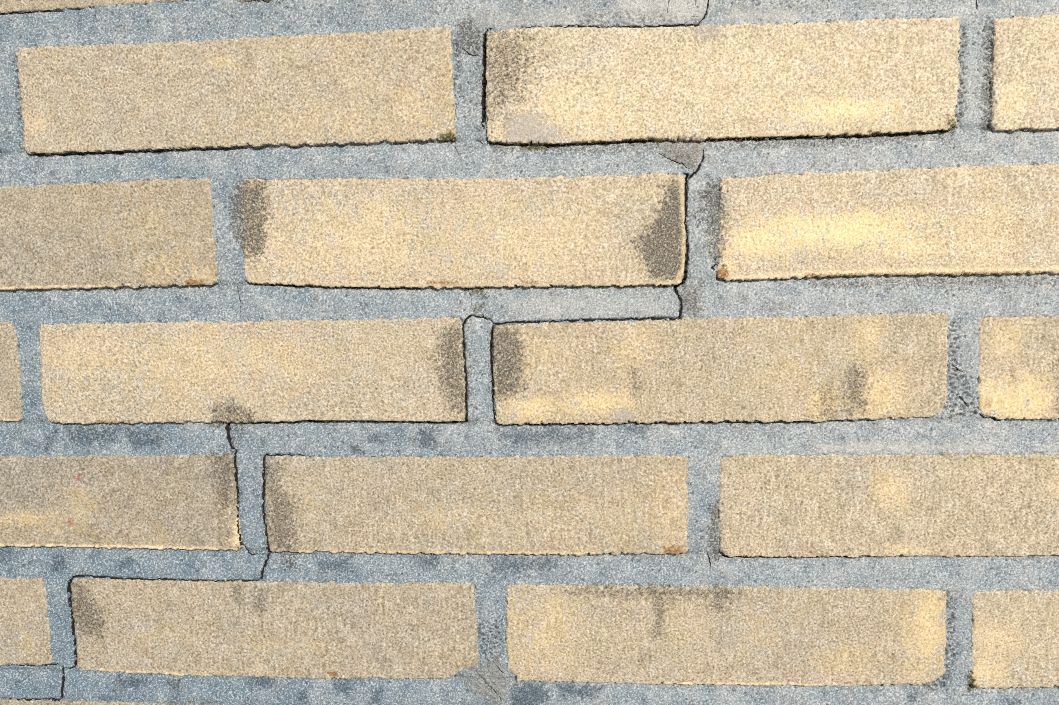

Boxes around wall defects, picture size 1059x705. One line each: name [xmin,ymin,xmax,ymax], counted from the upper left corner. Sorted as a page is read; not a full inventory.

crack [525,0,709,28]
crack [455,28,492,155]
crack [0,149,704,702]